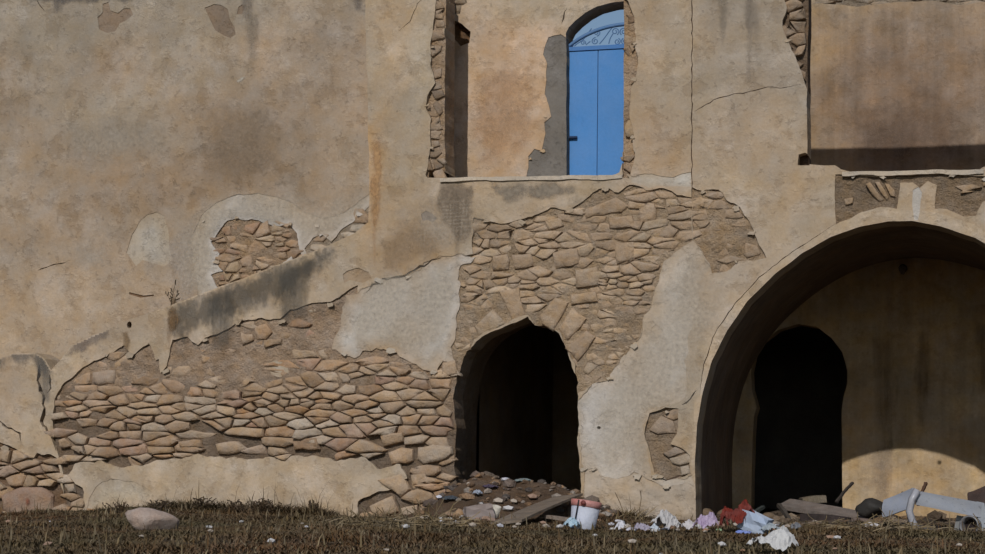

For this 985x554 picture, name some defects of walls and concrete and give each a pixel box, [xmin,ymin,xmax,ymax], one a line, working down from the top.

spalling [783,0,985,96]
crack [691,87,787,193]
spalling [835,174,985,224]
spalling [0,0,766,521]